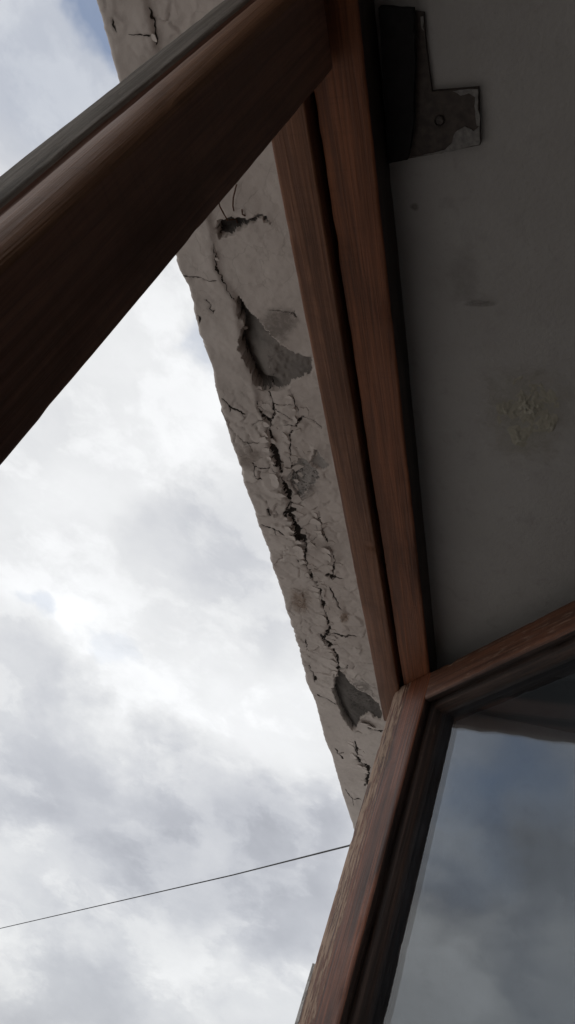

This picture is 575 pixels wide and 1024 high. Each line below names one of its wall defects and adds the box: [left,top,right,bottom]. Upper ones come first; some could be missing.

crack [112,8,158,45]
spalling [218,184,268,234]
crack [183,244,234,323]
spalling [237,299,312,390]
crack [221,374,355,705]
spalling [335,669,382,735]
crack [335,727,383,805]